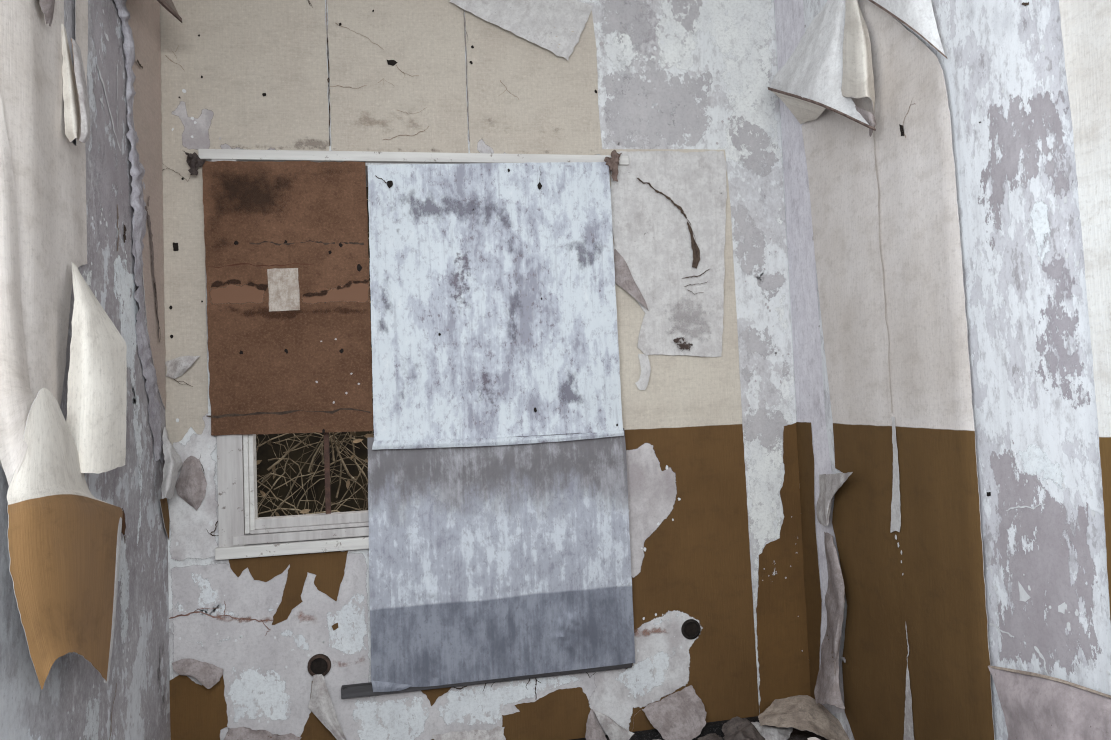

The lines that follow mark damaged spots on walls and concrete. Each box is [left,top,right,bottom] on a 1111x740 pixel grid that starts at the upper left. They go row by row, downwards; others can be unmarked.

peeling [599,0,837,664]
flaking render [972,80,1090,409]
flaking render [168,412,702,740]
flaking render [987,440,1110,676]